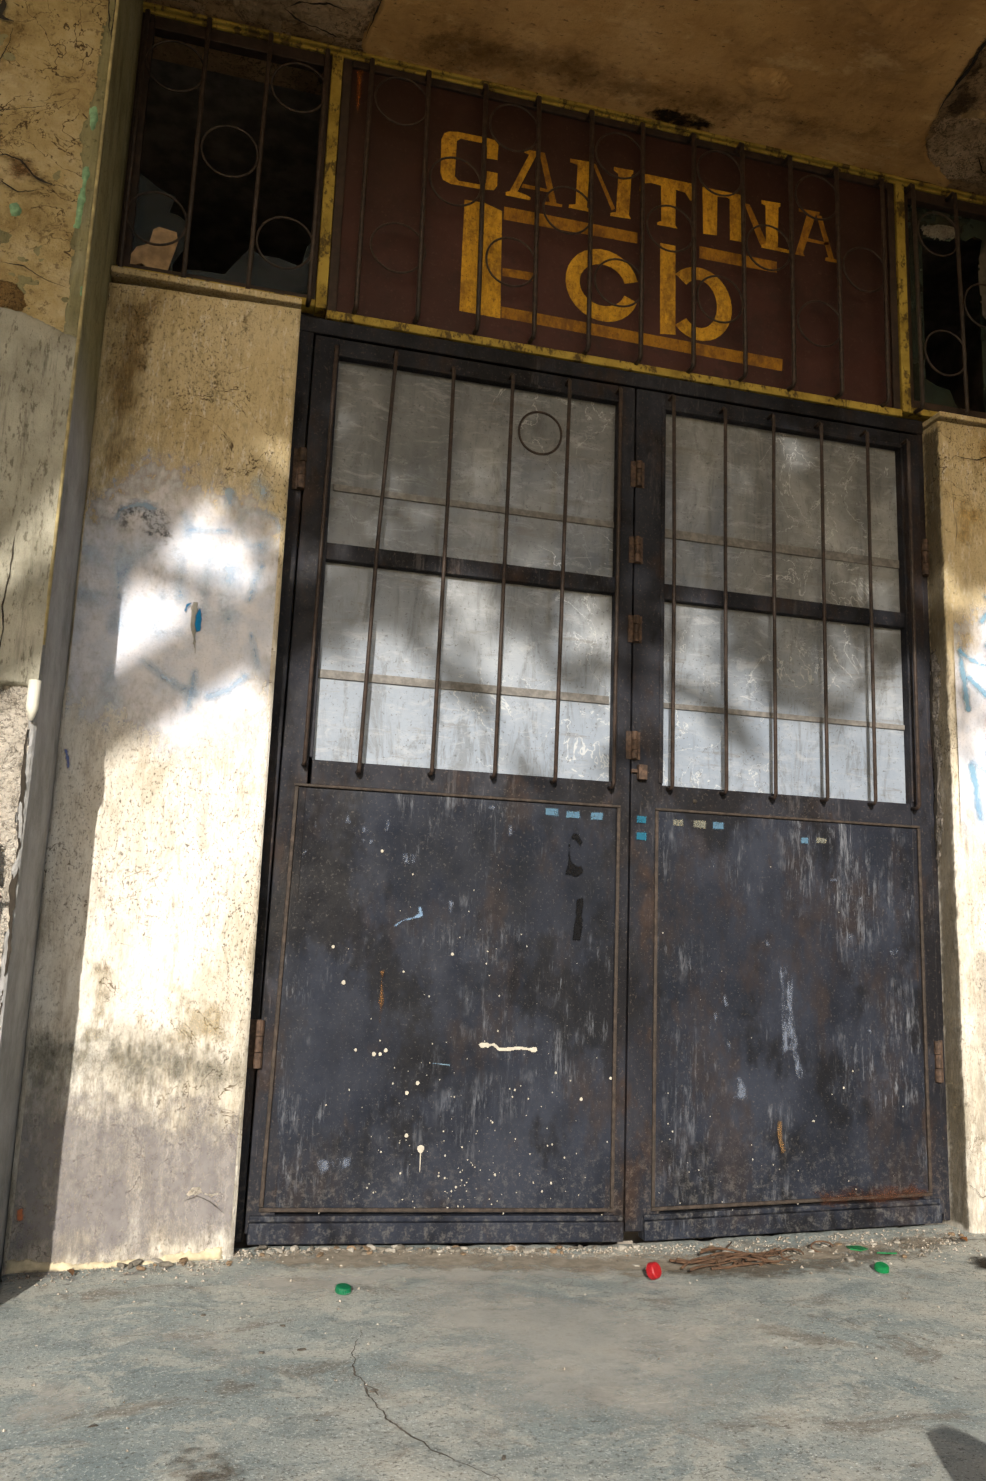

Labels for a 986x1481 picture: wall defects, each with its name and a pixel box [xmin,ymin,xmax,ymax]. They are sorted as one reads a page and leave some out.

spalling [144,0,380,50]
crack [284,0,382,38]
peeling [0,0,108,332]
spalling [926,39,986,196]
spalling [0,685,29,966]
damp [108,1041,222,1078]
damp [9,1098,238,1258]
spalling [5,1247,223,1275]
crack [351,1325,501,1481]